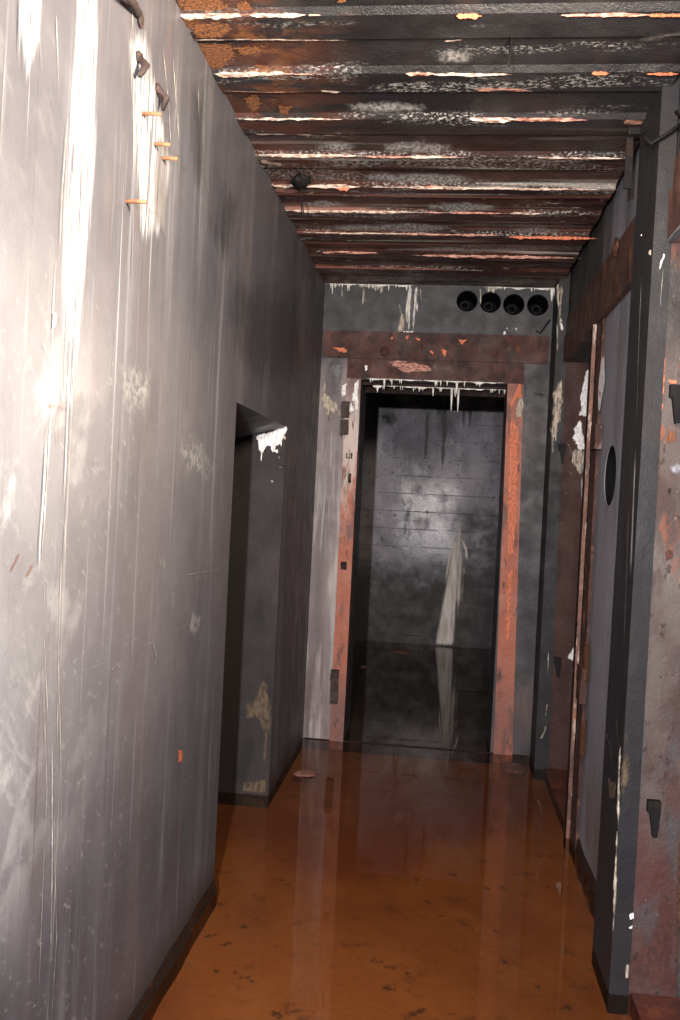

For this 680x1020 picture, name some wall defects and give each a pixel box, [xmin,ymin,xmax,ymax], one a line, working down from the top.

corrosion [178,0,268,69]
corrosion [245,95,292,114]
water stain [330,283,421,332]
water stain [480,286,563,350]
water stain [368,378,505,464]
peeling [552,381,562,441]